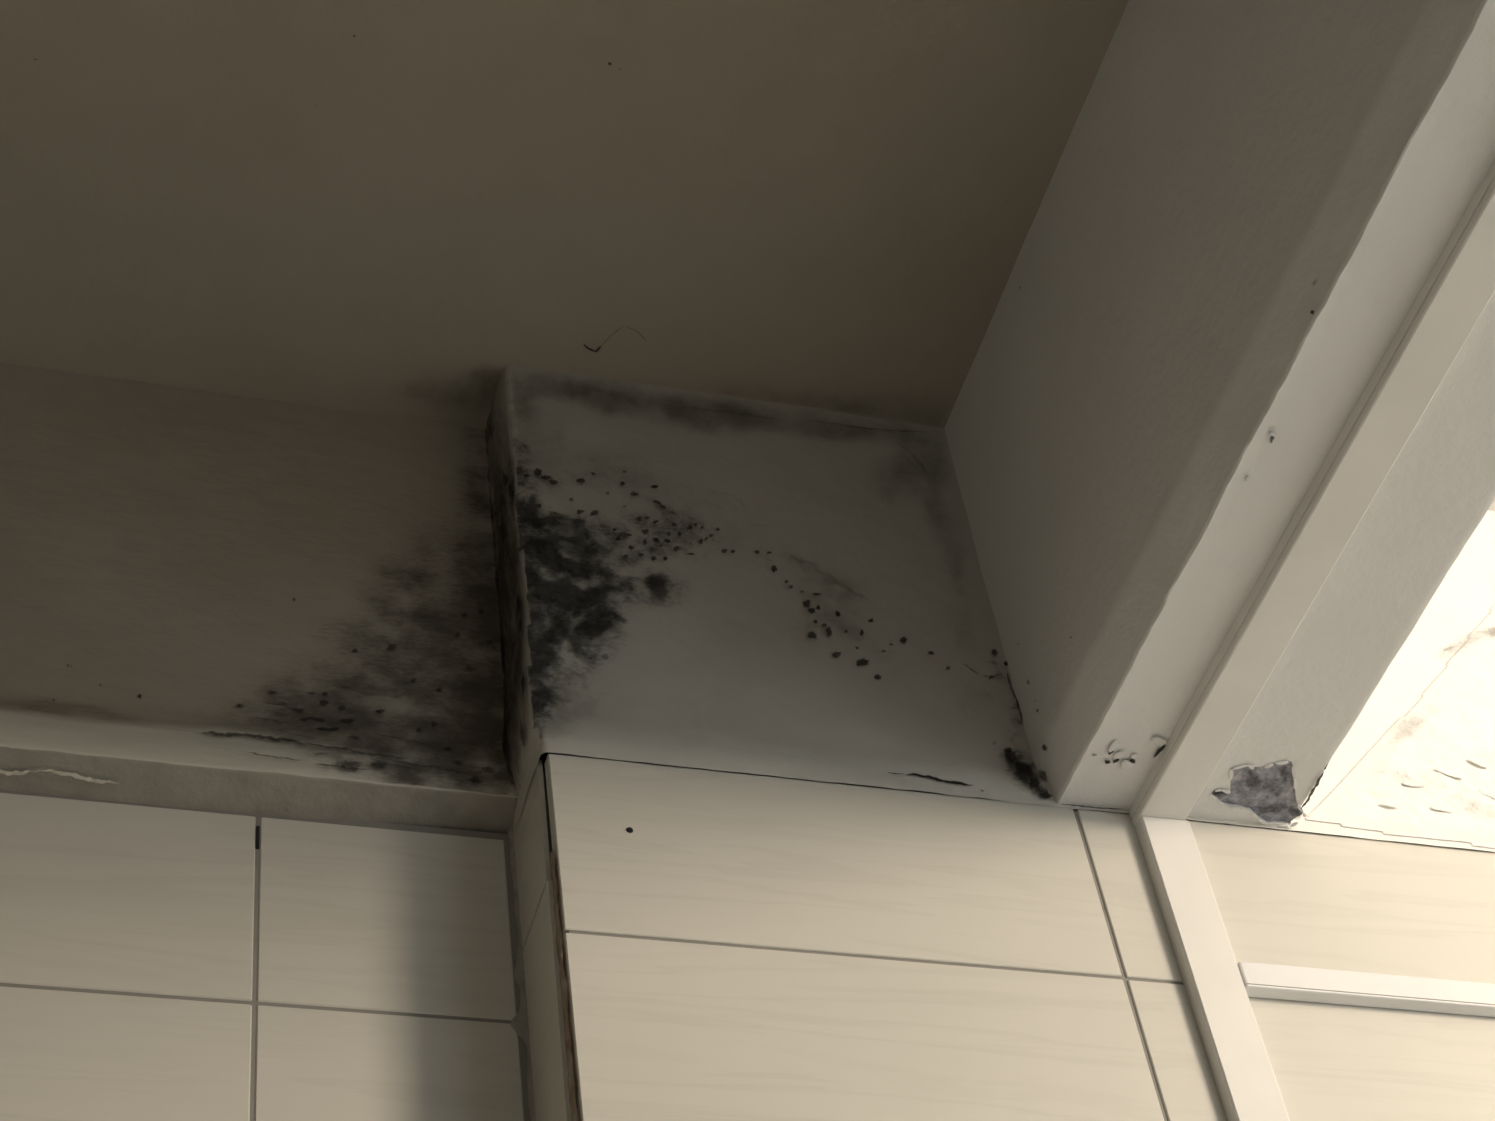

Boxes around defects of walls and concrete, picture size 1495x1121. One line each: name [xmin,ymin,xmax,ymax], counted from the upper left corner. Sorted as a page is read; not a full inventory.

water stain [203,416,735,794]
water stain [754,550,907,679]
water stain [974,649,1038,722]
water stain [1004,744,1052,798]
flaking render [1211,761,1306,828]